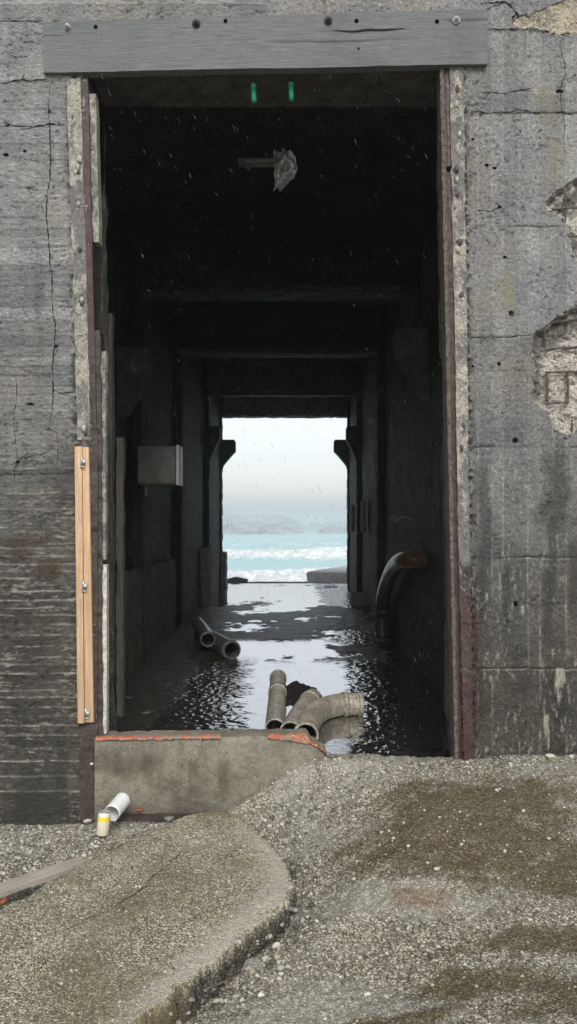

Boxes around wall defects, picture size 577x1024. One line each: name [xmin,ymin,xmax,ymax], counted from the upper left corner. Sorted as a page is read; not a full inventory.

crack [474,1,576,138]
spalling [513,0,577,35]
crack [2,55,74,484]
spalling [546,179,577,263]
spalling [530,306,577,439]